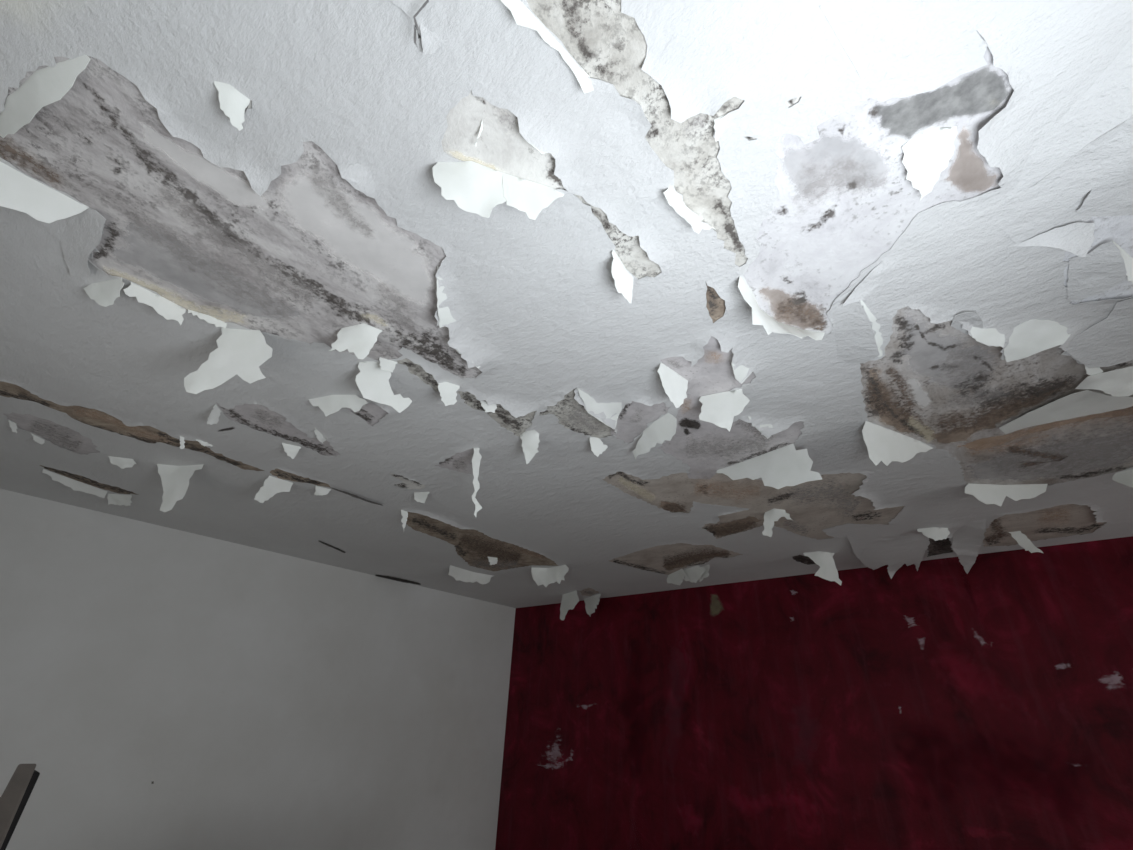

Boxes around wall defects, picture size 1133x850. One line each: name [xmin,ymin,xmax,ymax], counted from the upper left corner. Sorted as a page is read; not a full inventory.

peeling [0,54,1133,585]
peeling [500,0,1133,340]
peeling [390,448,601,620]